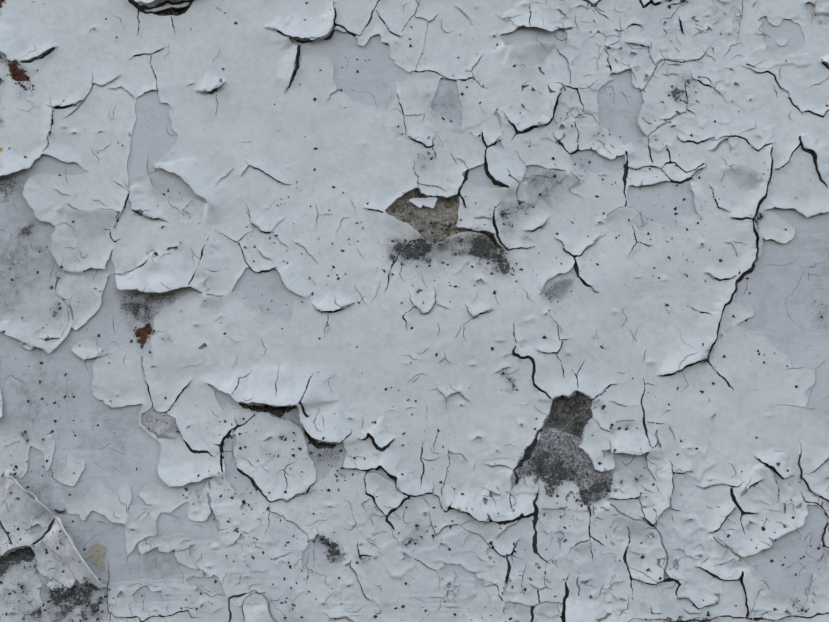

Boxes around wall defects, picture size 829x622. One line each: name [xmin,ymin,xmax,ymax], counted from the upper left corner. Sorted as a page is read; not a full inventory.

corrosion [6,60,34,90]
crack [19,0,194,152]
crack [38,156,189,341]
corrosion [134,323,155,349]
crack [298,239,448,382]
peeling [409,197,437,208]
crack [361,90,550,251]
crack [494,317,585,405]
crack [504,0,829,391]
crack [141,356,829,622]
peeling [504,376,666,511]
crack [83,555,286,622]